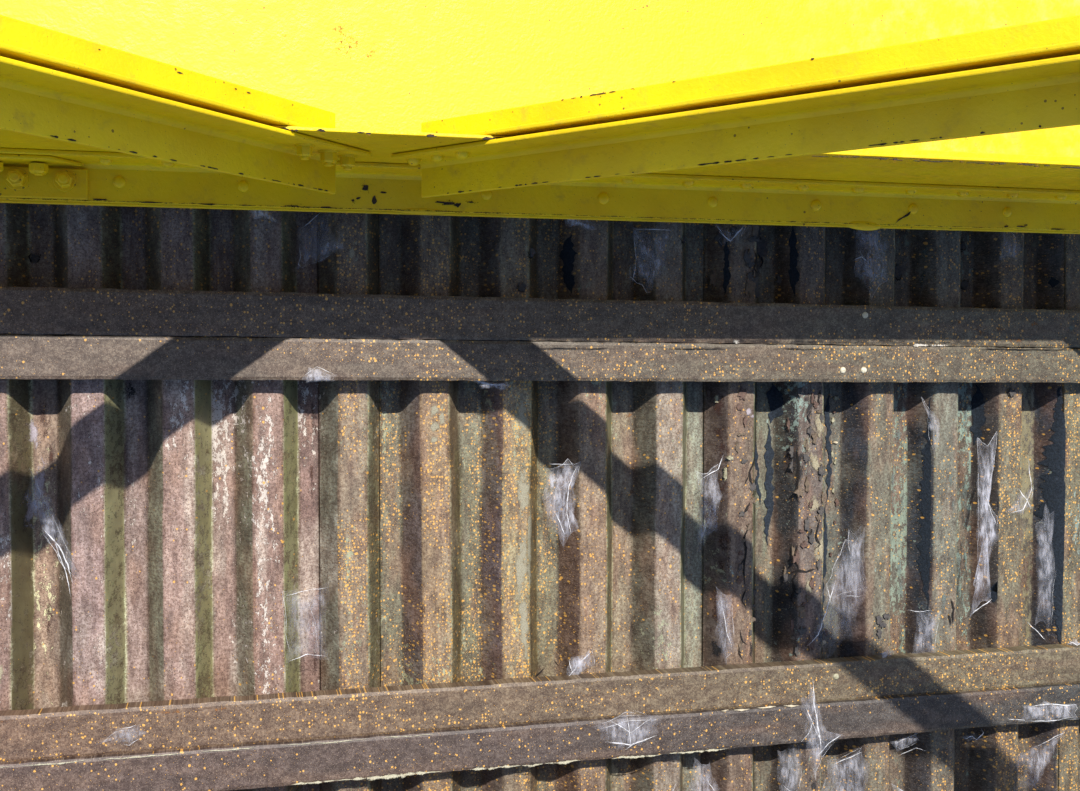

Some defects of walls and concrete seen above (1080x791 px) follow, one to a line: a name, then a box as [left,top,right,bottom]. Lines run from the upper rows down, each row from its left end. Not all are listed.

peeling [723,386,757,492]
peeling [782,396,840,607]